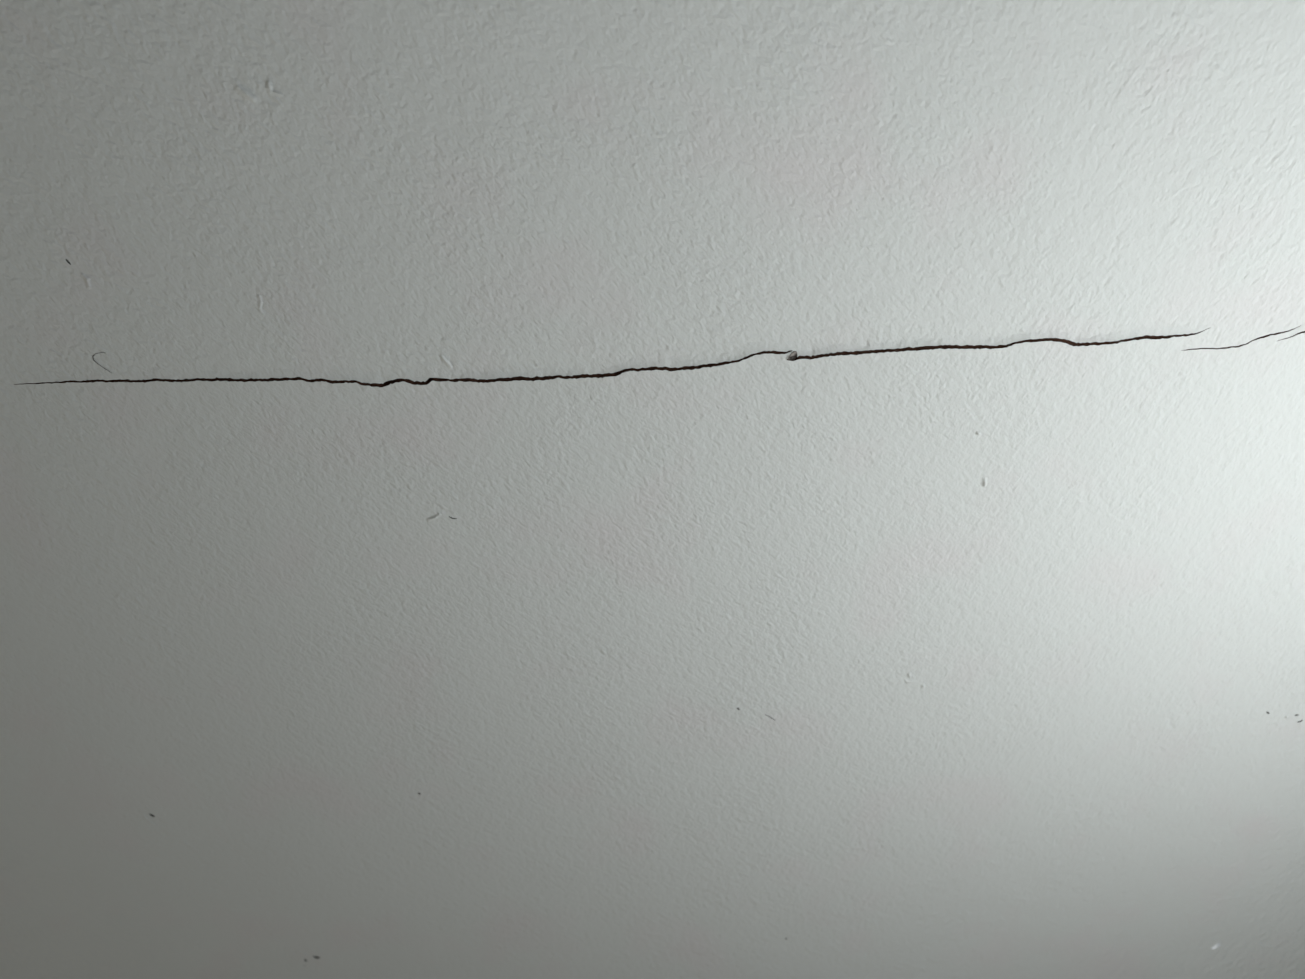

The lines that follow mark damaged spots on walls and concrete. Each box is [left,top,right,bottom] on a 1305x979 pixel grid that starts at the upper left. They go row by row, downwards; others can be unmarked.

crack [11,319,1305,394]